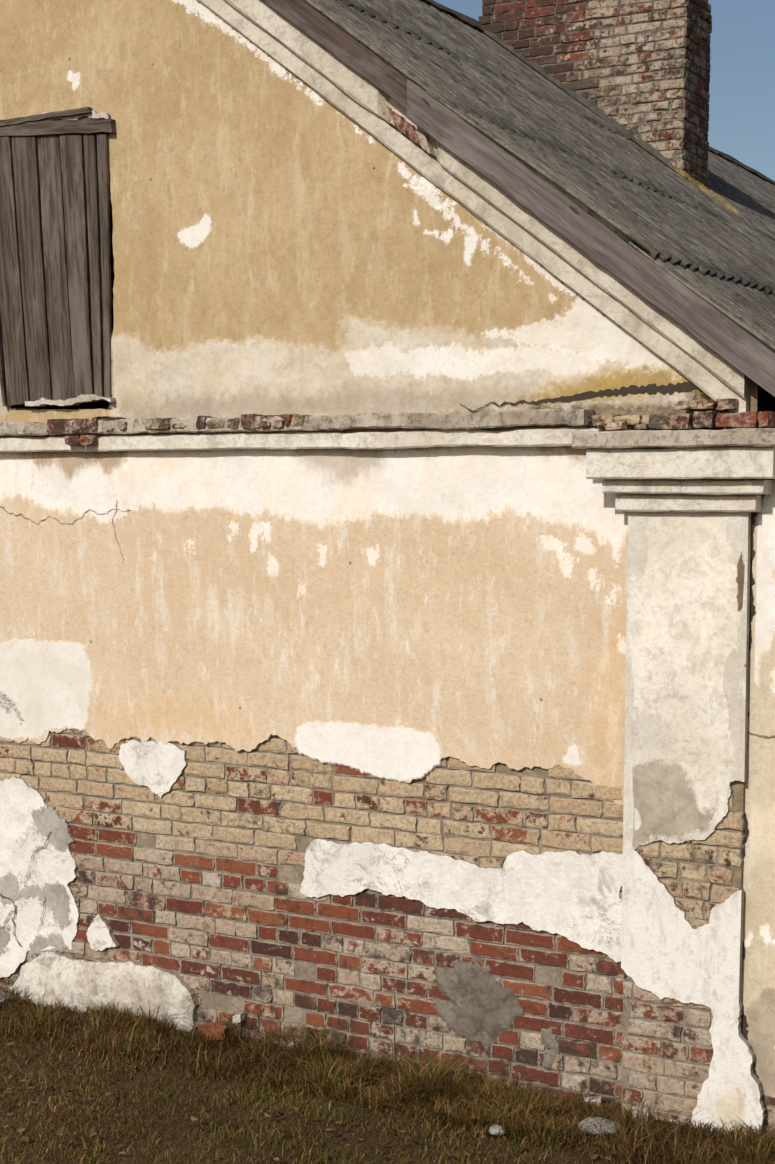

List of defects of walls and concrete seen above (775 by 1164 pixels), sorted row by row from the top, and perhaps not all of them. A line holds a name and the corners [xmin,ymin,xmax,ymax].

peeling [171,0,326,107]
peeling [46,153,775,446]
water stain [120,386,528,419]
crack [0,500,131,560]
crack [749,479,774,658]
crack [747,711,775,750]
spalling [0,446,775,1137]
crack [742,812,750,858]
crack [740,1006,759,1078]